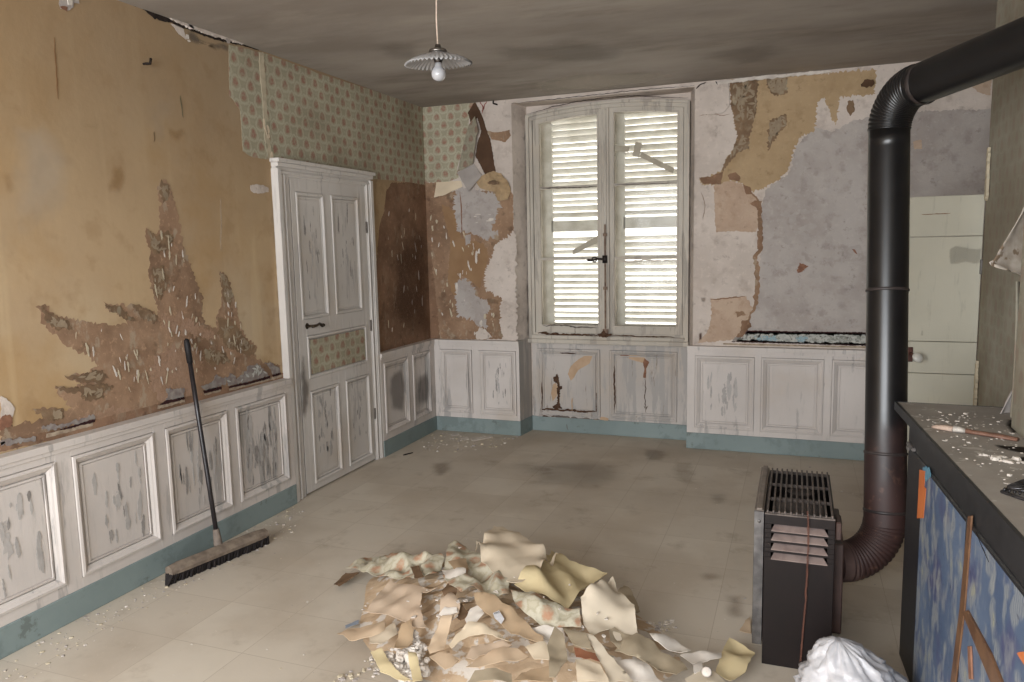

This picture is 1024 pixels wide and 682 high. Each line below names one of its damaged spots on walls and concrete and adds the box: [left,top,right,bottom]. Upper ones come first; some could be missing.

crack [135,6,258,50]
peeling [169,18,519,352]
flaking render [698,68,877,348]
flaking render [910,109,991,260]
peeling [0,179,283,452]
peeling [543,356,592,417]
peeling [620,355,649,378]